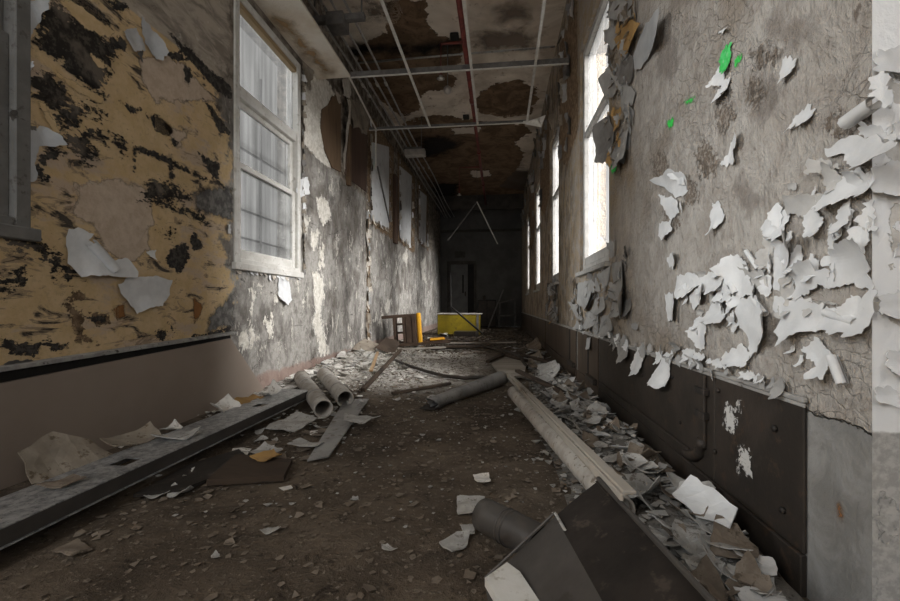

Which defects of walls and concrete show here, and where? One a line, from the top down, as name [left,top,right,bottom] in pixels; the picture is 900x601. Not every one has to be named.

peeling [9,0,232,183]
damp [480,31,529,50]
peeling [592,0,659,174]
flaking render [0,177,208,365]
peeling [191,0,579,389]
peeling [545,38,900,399]